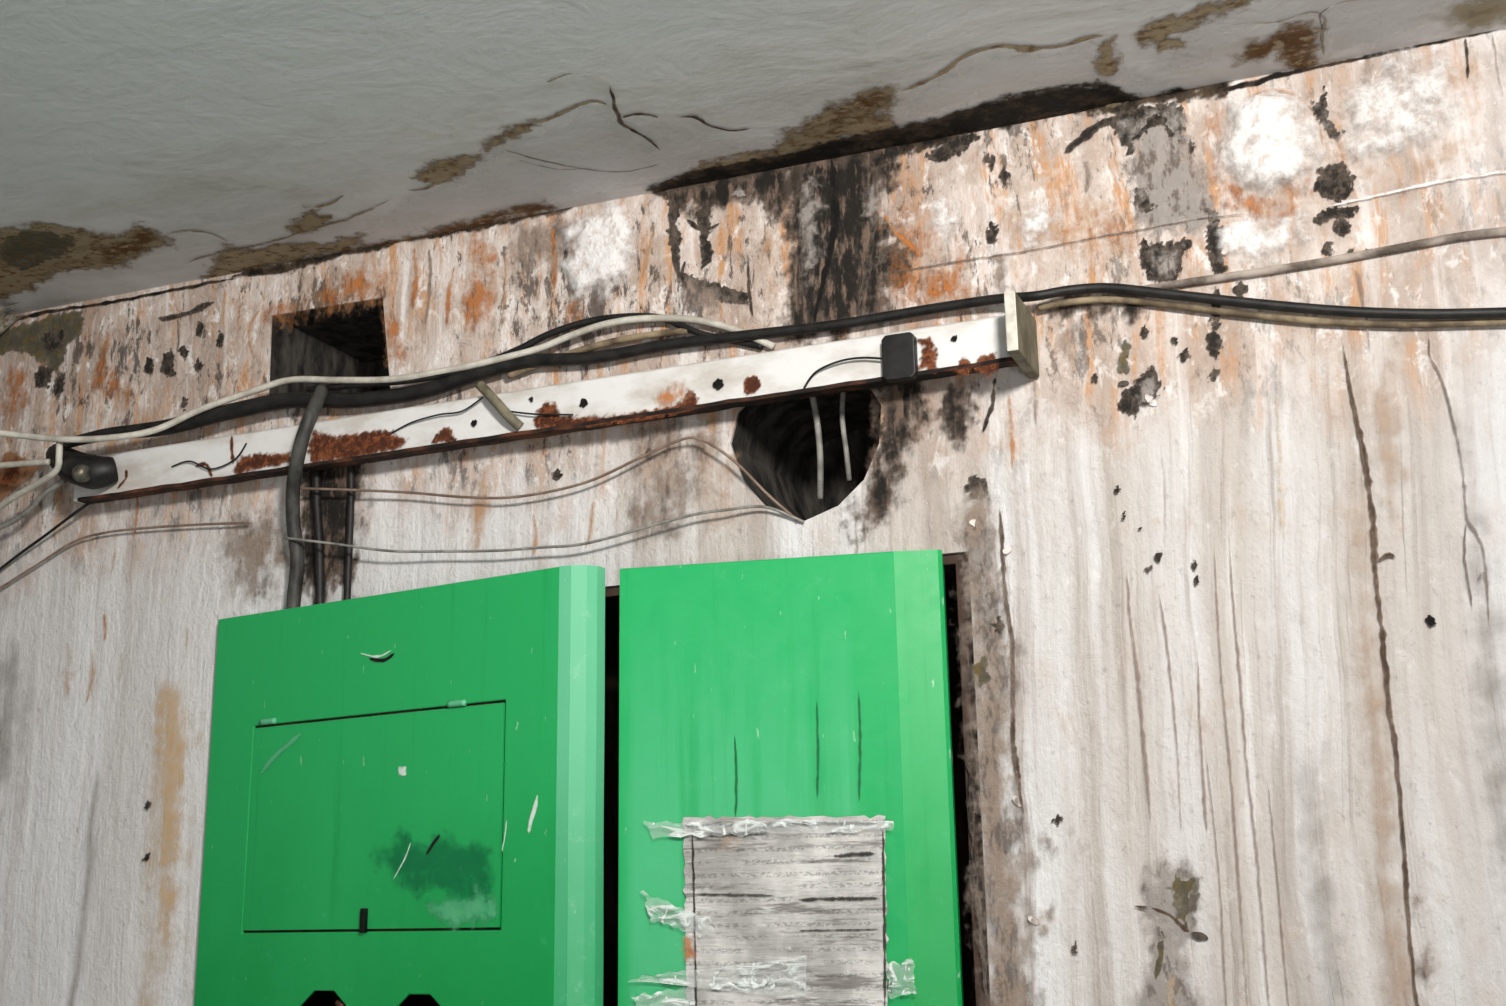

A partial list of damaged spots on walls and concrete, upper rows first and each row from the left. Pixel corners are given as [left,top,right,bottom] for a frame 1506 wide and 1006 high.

leakage [1239,0,1352,70]
peeling [317,201,387,228]
peeling [506,150,658,172]
peeling [669,167,796,221]
leakage [688,35,1121,345]
crack [610,30,1506,316]
leakage [0,195,365,307]
corrosion [230,429,406,474]
corrosion [432,427,457,443]
corrosion [475,486,486,530]
crack [1343,271,1432,1006]
leakage [1198,552,1289,1006]